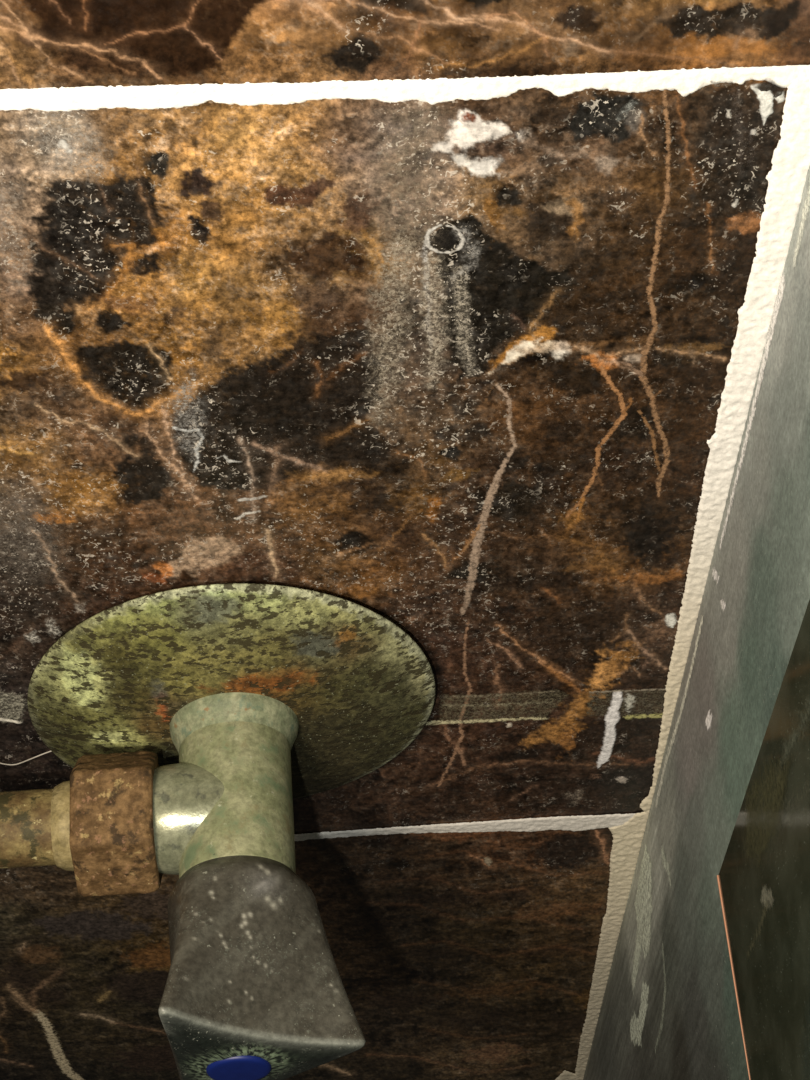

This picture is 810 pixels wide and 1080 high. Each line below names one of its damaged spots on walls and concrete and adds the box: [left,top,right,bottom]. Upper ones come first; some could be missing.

water stain [422,225,478,386]